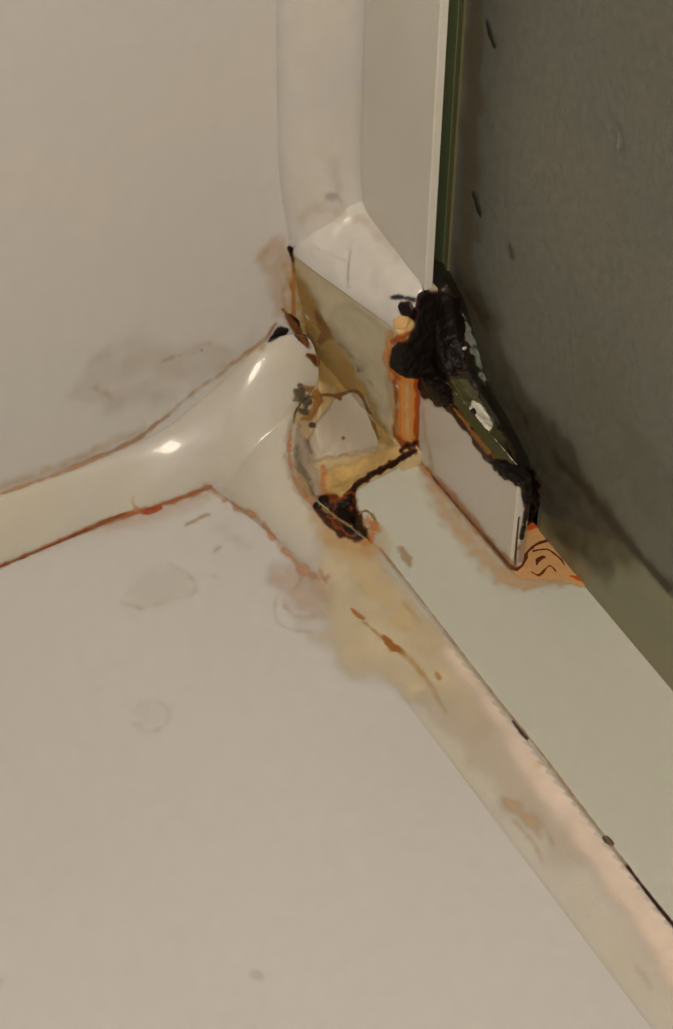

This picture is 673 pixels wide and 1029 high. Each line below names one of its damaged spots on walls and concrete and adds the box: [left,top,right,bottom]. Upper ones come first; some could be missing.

peeling [306,389,379,461]
rust [322,315,420,499]
rust [0,485,329,582]
rust [314,510,381,556]
rust [399,547,412,566]
rust [419,462,585,590]
rust [351,608,441,680]
leakage [313,492,673,988]